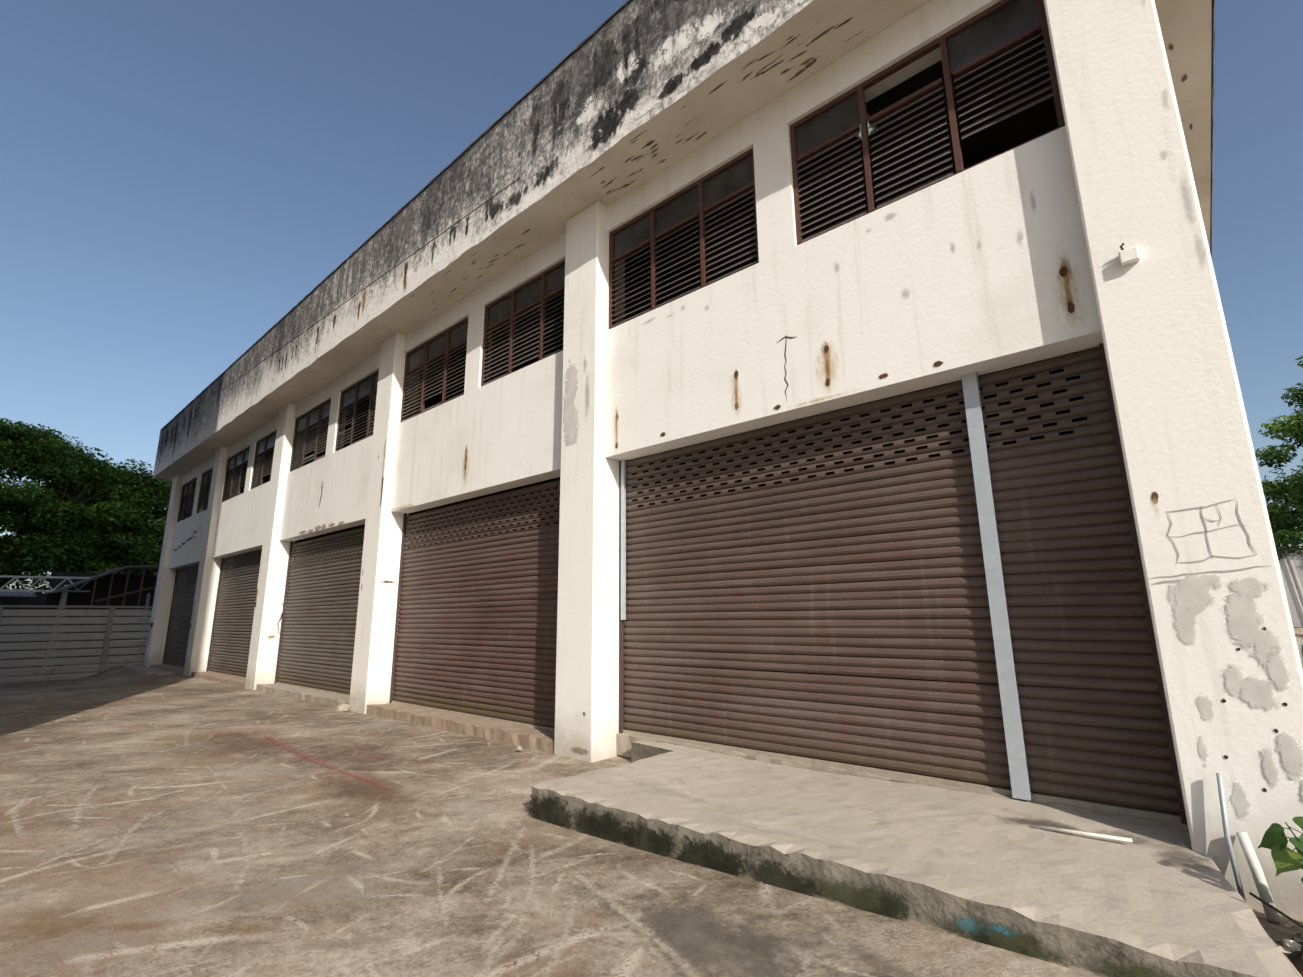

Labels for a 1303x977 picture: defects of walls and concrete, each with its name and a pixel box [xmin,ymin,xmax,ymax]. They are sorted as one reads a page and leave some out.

water stain [658,0,756,98]
water stain [485,0,677,222]
water stain [431,217,469,263]
water stain [315,248,367,352]
corrosion [1059,260,1075,313]
corrosion [812,345,830,402]
peeling [1168,574,1290,721]
peeling [1198,736,1228,767]
peeling [1261,729,1303,799]
peeling [1229,782,1251,817]